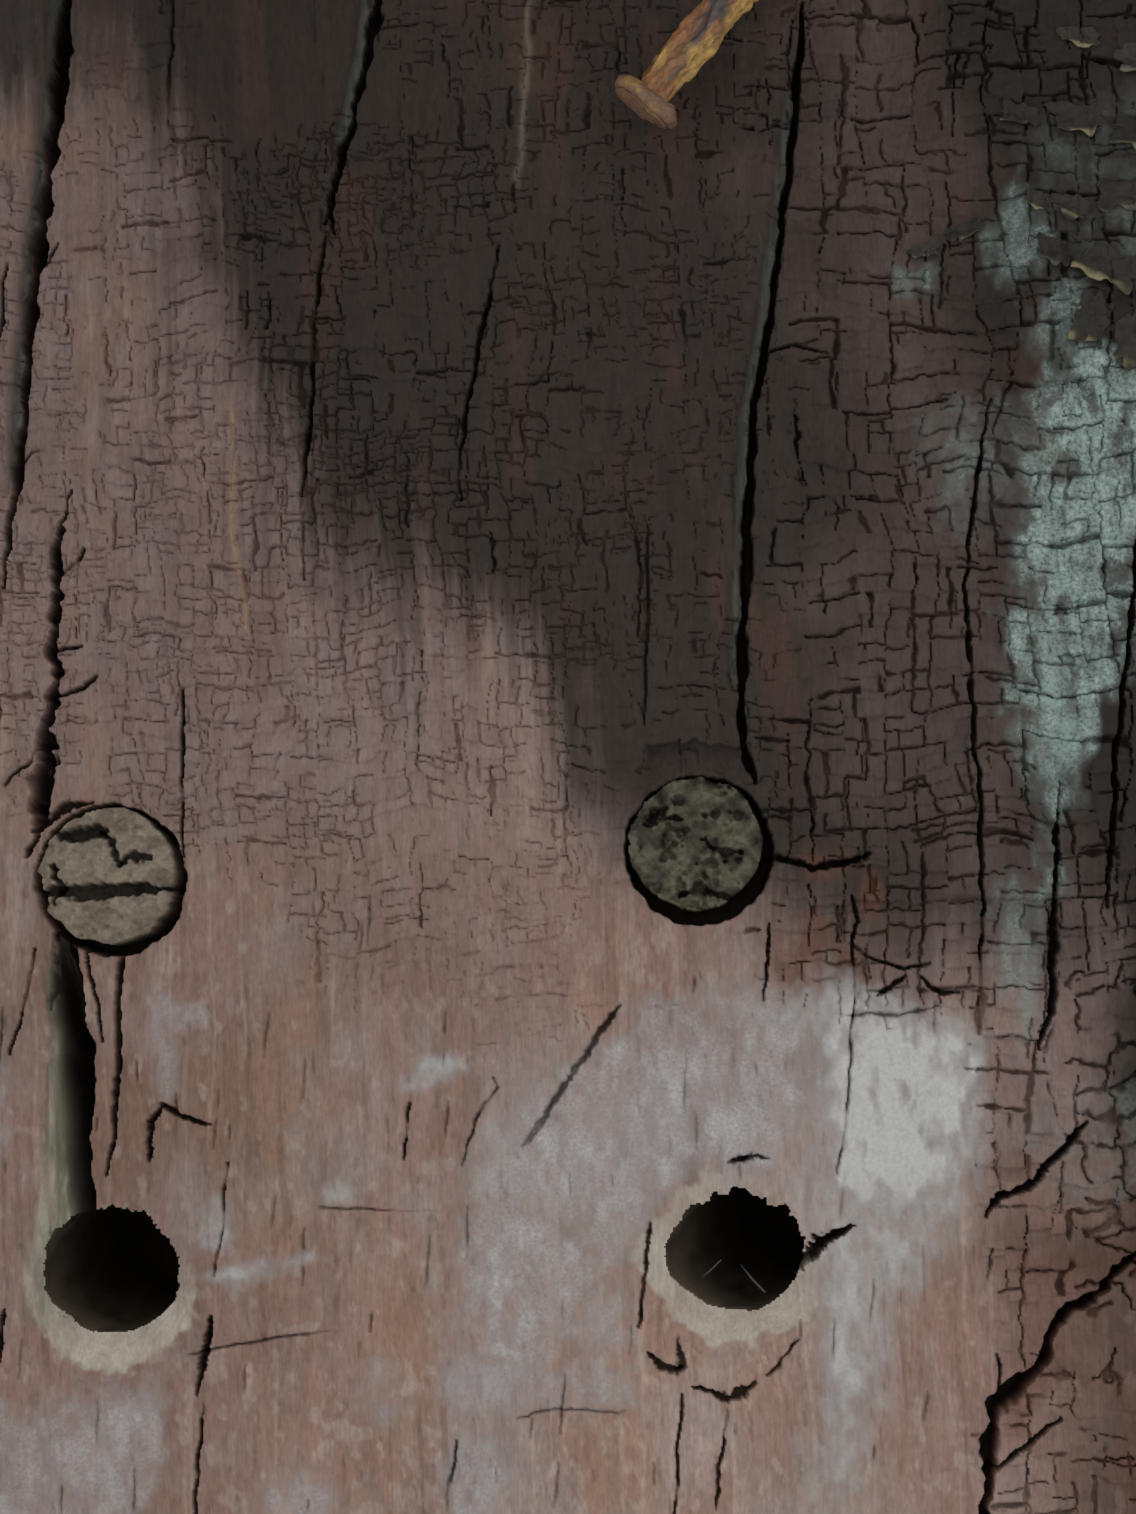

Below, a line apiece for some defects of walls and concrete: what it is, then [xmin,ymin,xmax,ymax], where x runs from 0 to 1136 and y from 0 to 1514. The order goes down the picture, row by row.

crack [0,0,1136,1135]
damp [1007,347,1136,811]
crack [799,1223,857,1272]